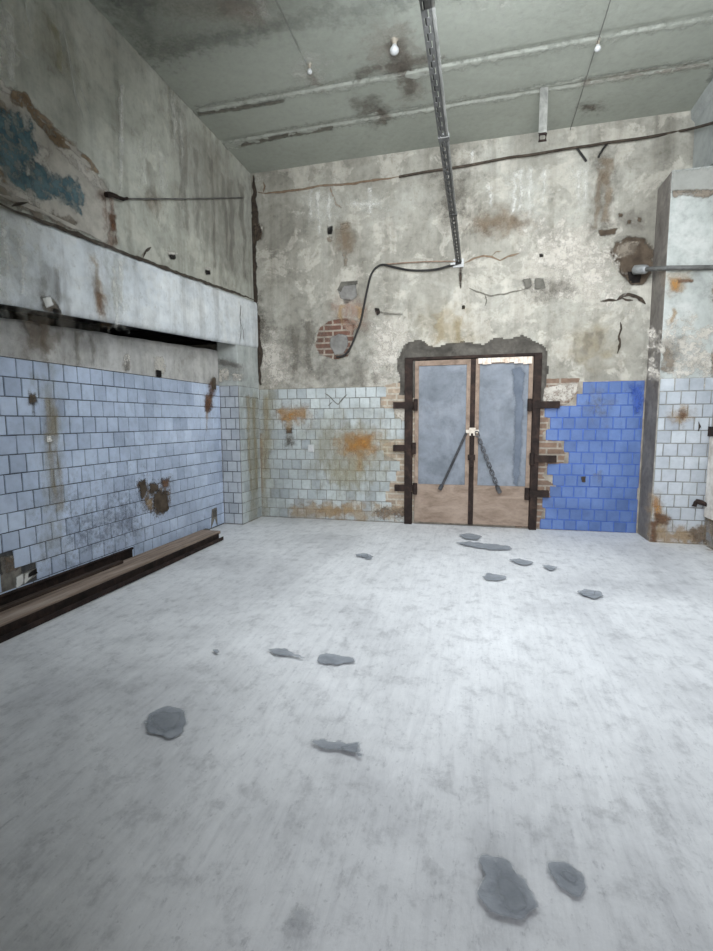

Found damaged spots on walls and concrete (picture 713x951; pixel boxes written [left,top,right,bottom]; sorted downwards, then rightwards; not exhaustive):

water stain [357,45,435,94]
peeling [0,80,111,243]
peeling [519,213,654,307]
flaking render [314,318,357,360]
corrosion [205,377,216,412]
peeling [369,319,415,512]
peeling [515,378,580,529]
spalling [136,477,172,517]
corrosion [650,500,669,542]
peeling [0,555,38,593]